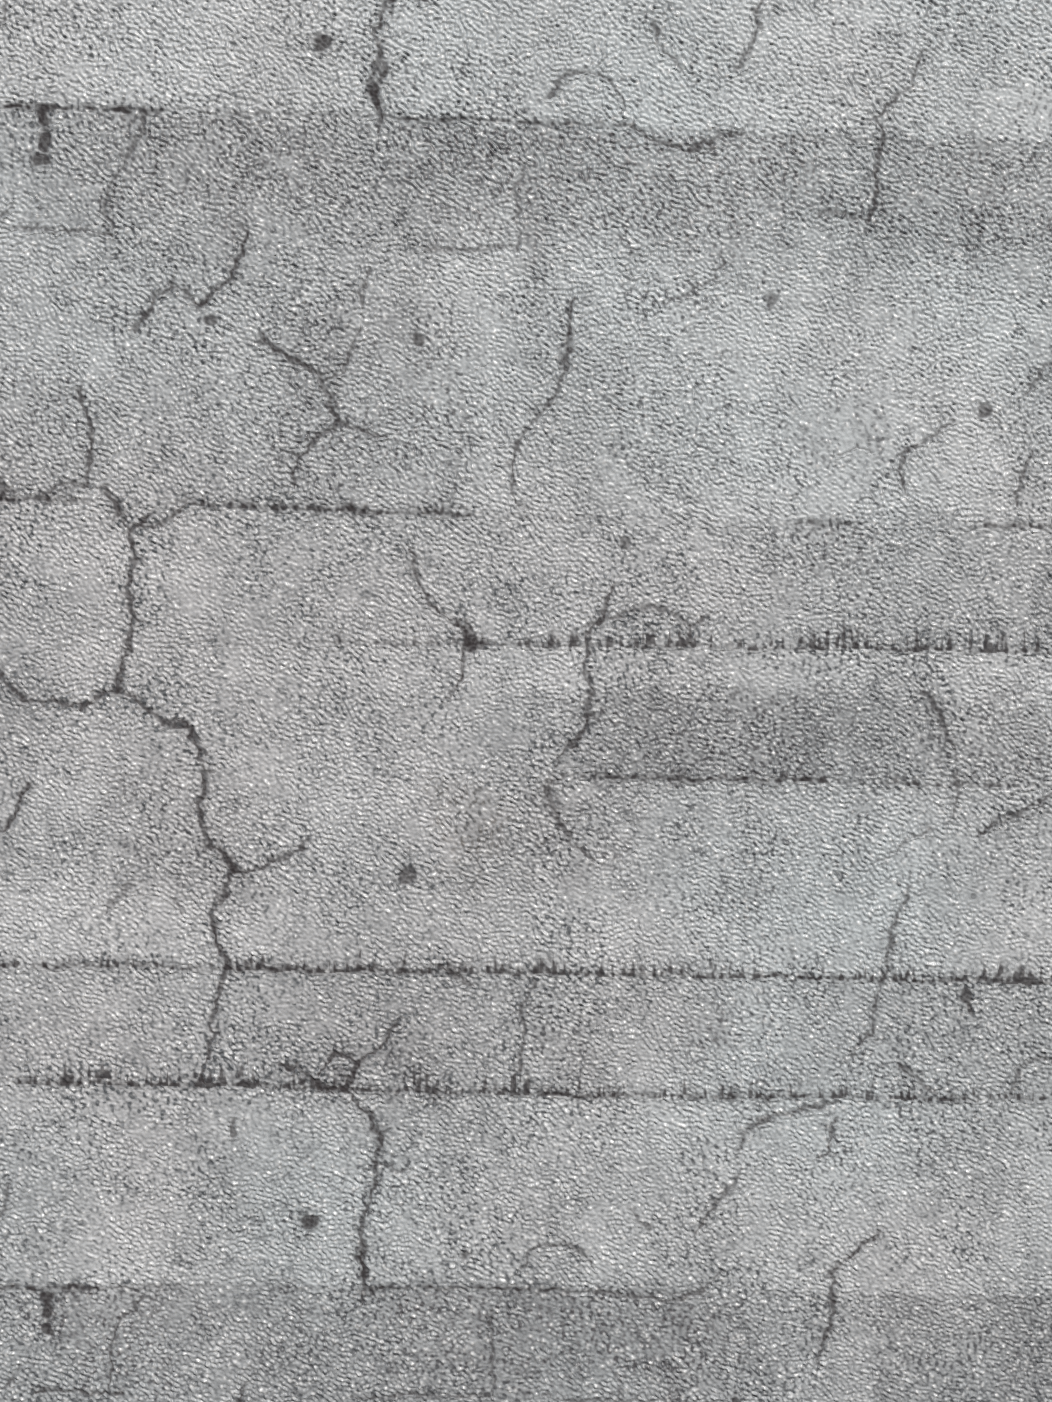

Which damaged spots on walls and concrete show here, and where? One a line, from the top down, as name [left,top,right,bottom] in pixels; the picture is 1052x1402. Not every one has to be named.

crack [361,0,433,137]
crack [126,222,251,338]
crack [255,266,389,493]
crack [0,383,311,1093]
crack [534,580,713,863]
crack [848,683,1052,1102]
crack [510,976,540,1085]
crack [275,1014,414,1311]
crack [690,1099,841,1238]
crack [348,1305,499,1402]
crack [516,1235,727,1306]
crack [814,1225,884,1372]